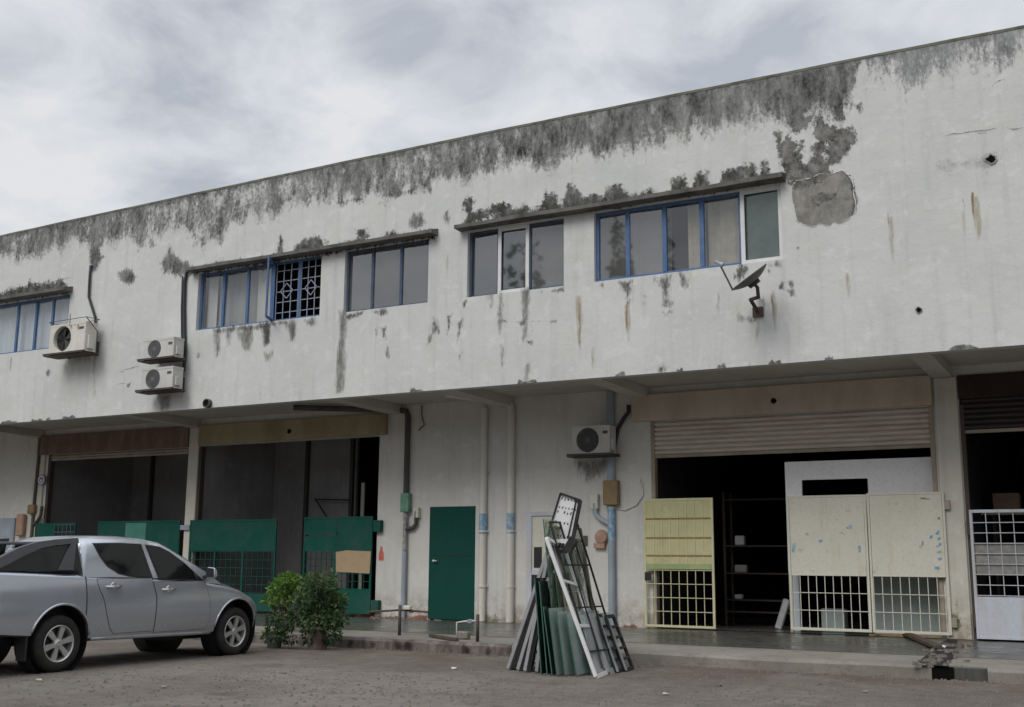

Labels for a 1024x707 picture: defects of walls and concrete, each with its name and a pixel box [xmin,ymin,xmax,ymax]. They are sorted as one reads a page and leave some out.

damp [0,28,1024,277]
peeling [773,114,858,228]
spalling [983,153,998,165]
damp [118,270,134,285]
damp [217,321,295,356]
damp [337,312,361,392]